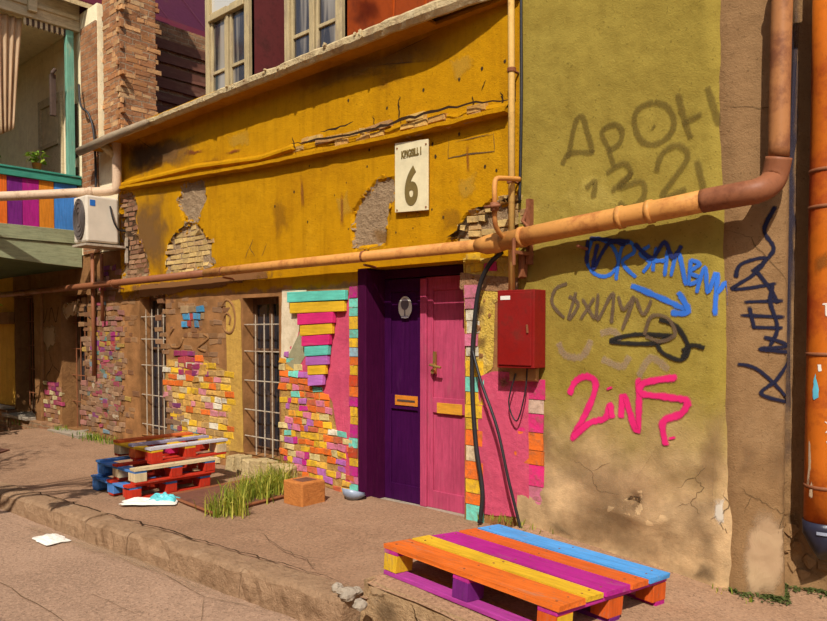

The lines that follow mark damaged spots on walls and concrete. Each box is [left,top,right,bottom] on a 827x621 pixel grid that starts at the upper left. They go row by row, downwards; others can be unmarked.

crack [292,80,516,148]
crack [448,133,495,159]
flaking render [348,174,397,250]
spalling [447,193,526,242]
flaking render [63,179,267,439]
crack [677,465,784,533]